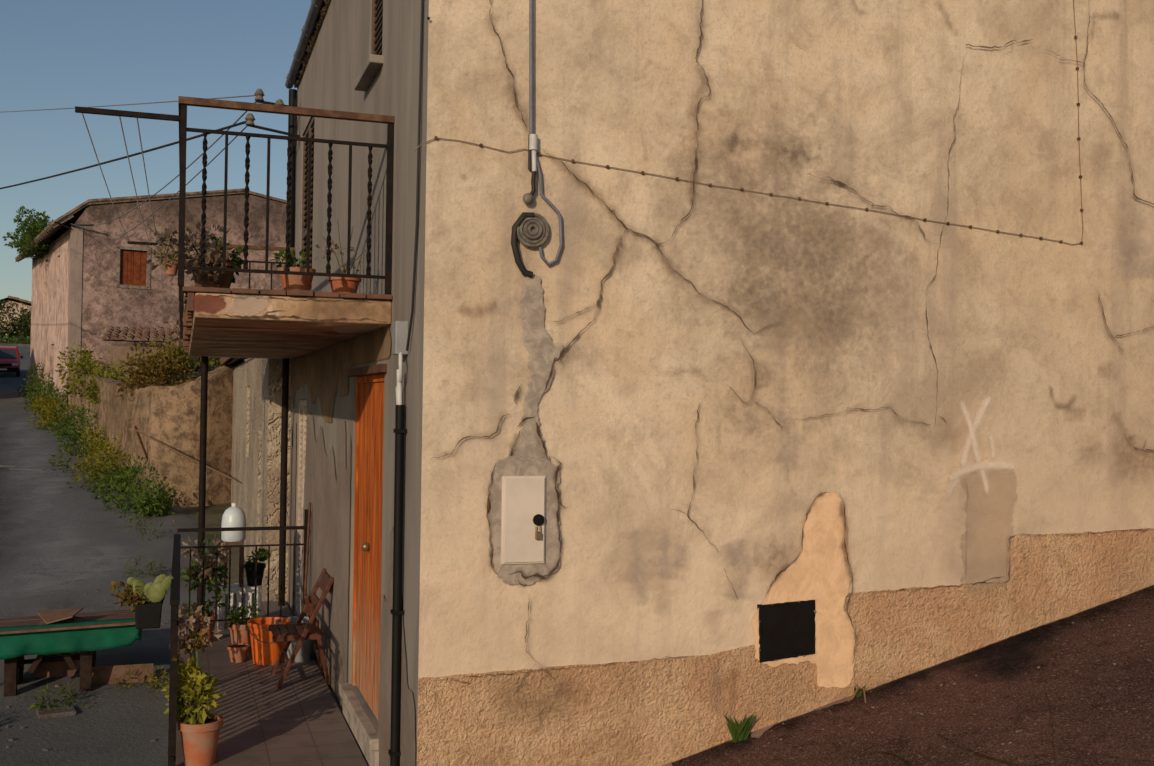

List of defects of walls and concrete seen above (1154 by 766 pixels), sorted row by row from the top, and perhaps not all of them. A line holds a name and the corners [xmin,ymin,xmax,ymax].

spalling [192,294,226,314]
crack [433,0,1154,697]
peeling [287,325,391,712]
peeling [377,528,415,766]
peeling [753,492,856,688]